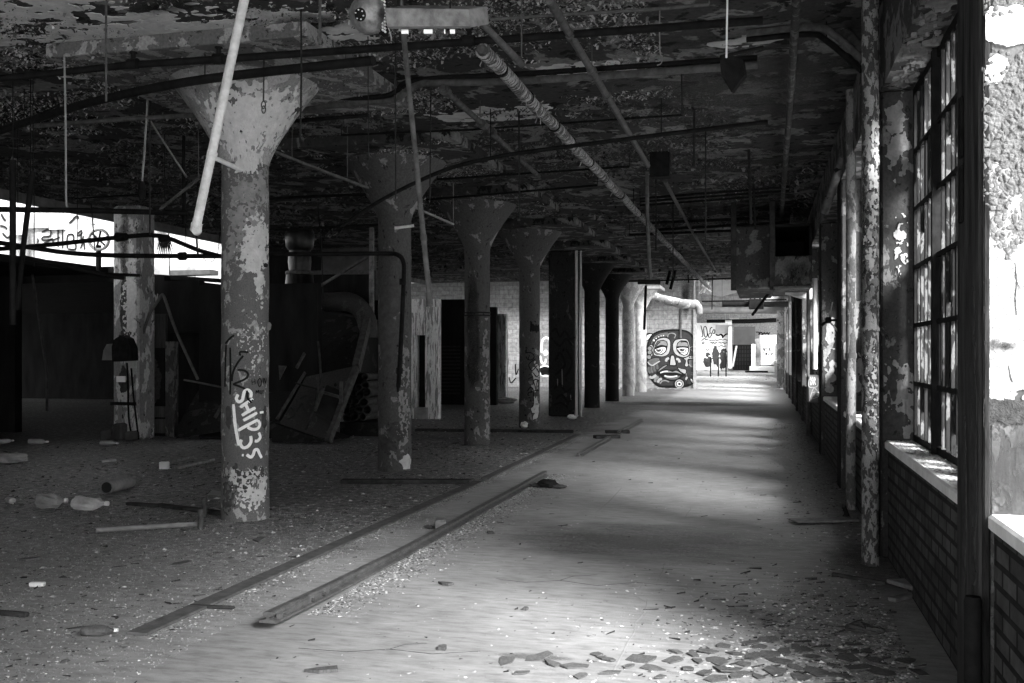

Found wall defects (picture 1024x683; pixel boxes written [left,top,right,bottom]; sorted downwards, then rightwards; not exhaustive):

peeling [985,4,1024,84]
peeling [0,0,826,376]
peeling [803,0,957,451]
peeling [118,361,137,397]
peeling [379,277,411,469]
peeling [481,318,490,440]
peeling [222,462,269,515]